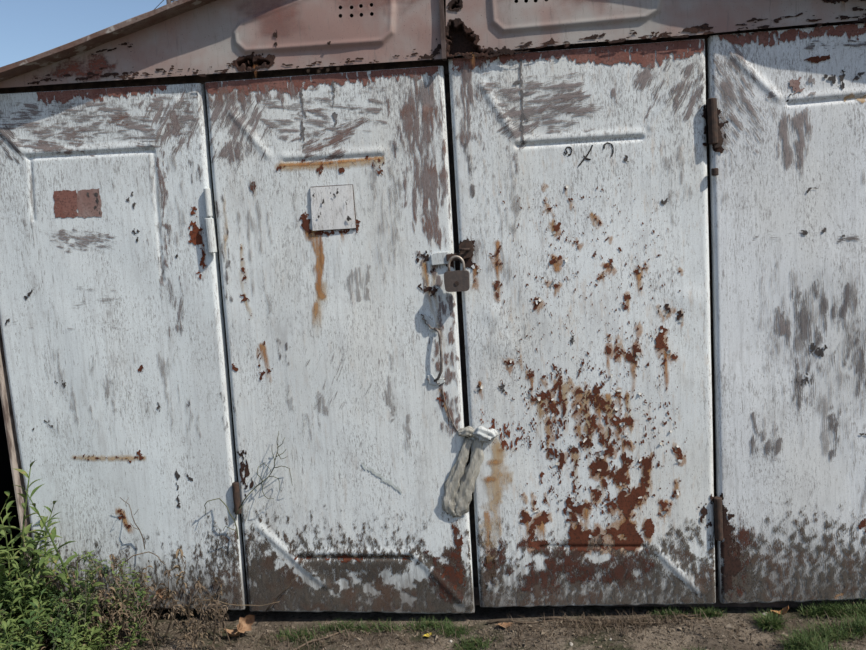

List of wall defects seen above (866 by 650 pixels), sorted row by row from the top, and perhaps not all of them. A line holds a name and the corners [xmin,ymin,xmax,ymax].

peeling [804,37,866,63]
rust [276,156,384,177]
peeling [452,46,603,237]
peeling [634,45,865,181]
rust [188,206,207,279]
peeling [0,66,466,440]
rust [299,212,361,317]
rust [412,238,481,296]
peeling [750,263,866,461]
peeling [476,409,532,452]
rust [504,304,689,556]
rust [696,493,743,595]